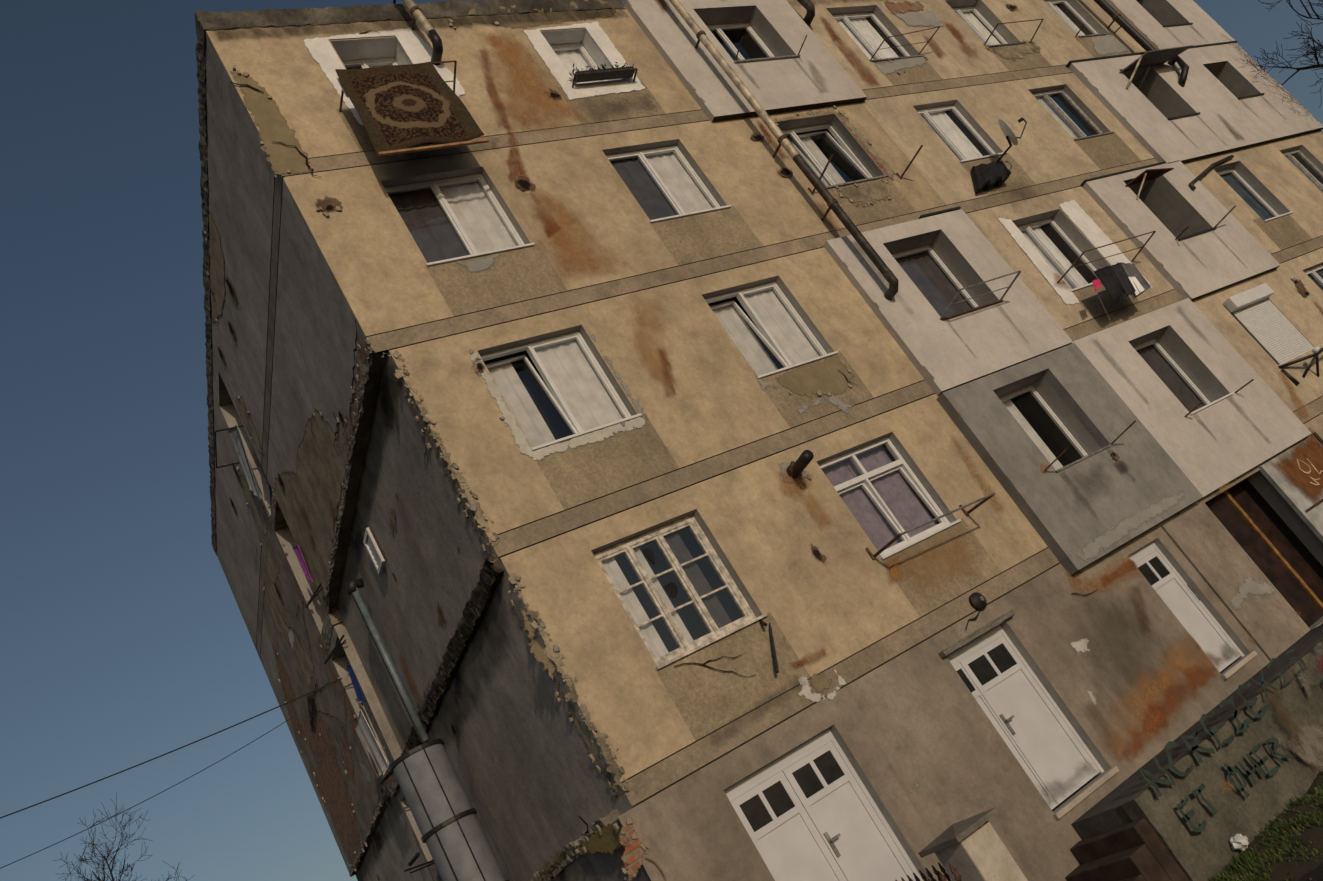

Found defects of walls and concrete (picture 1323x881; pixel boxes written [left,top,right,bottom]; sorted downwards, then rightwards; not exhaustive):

peeling [230,65,313,177]
rust [483,35,569,178]
peeling [204,211,236,342]
rust [1274,432,1323,501]
peeling [230,319,499,872]
rust [1072,558,1139,589]
peeling [508,573,638,798]
flaking render [571,816,650,881]